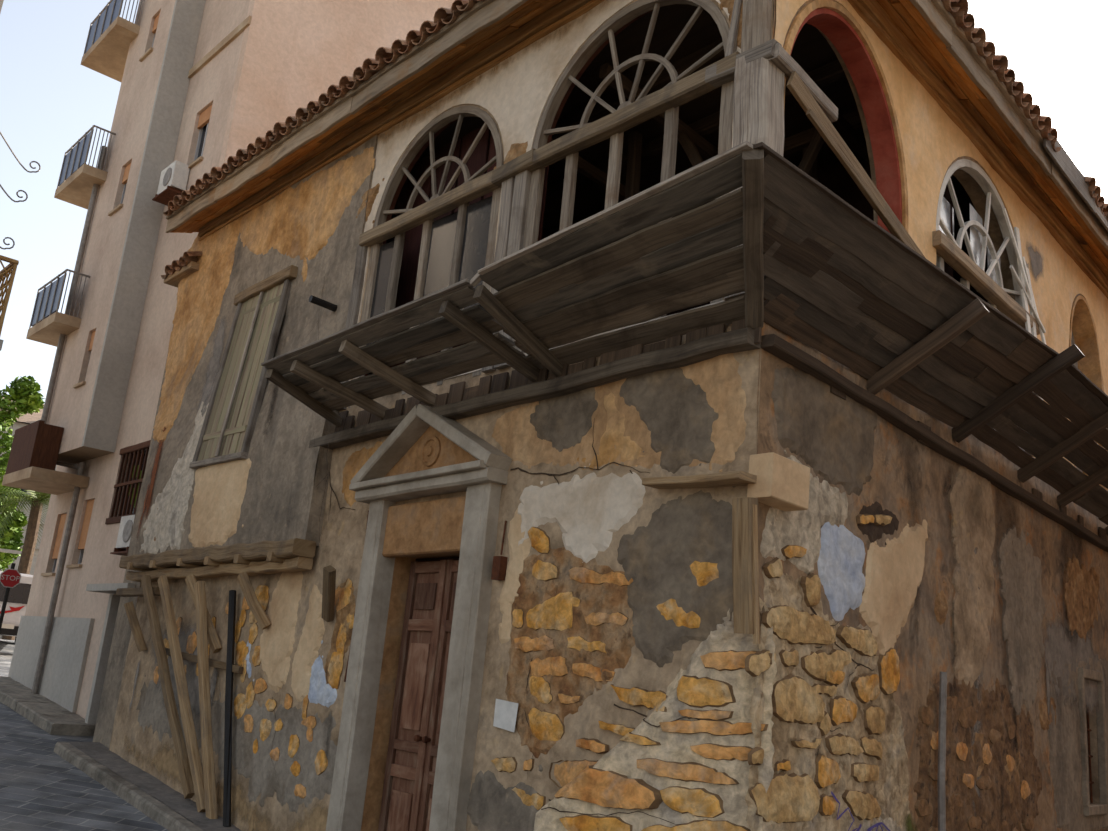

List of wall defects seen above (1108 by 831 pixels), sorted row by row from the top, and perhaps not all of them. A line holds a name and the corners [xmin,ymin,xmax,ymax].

peeling [153,147,385,442]
peeling [140,401,252,554]
peeling [212,571,356,799]
peeling [342,440,385,507]
spalling [492,378,662,772]
crack [510,418,649,484]
peeling [680,353,747,473]
spalling [745,367,1042,831]